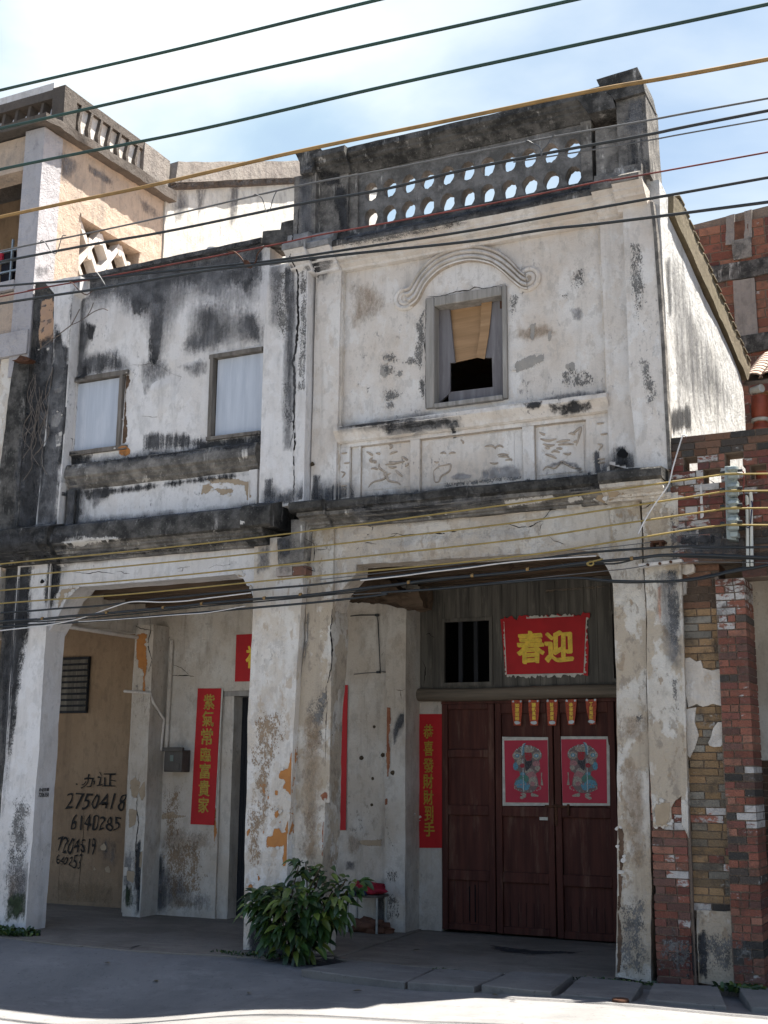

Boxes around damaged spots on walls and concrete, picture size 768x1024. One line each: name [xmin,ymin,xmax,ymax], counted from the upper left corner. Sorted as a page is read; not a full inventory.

damp [175,168,590,247]
damp [630,244,645,325]
flaking render [114,372,130,456]
crack [289,209,300,500]
damp [640,359,657,402]
damp [0,239,331,755]
flaking render [201,476,251,500]
crack [325,609,333,735]
flaking render [685,658,722,757]
flaking render [259,747,299,866]
damp [6,795,34,921]
spalling [697,910,734,985]